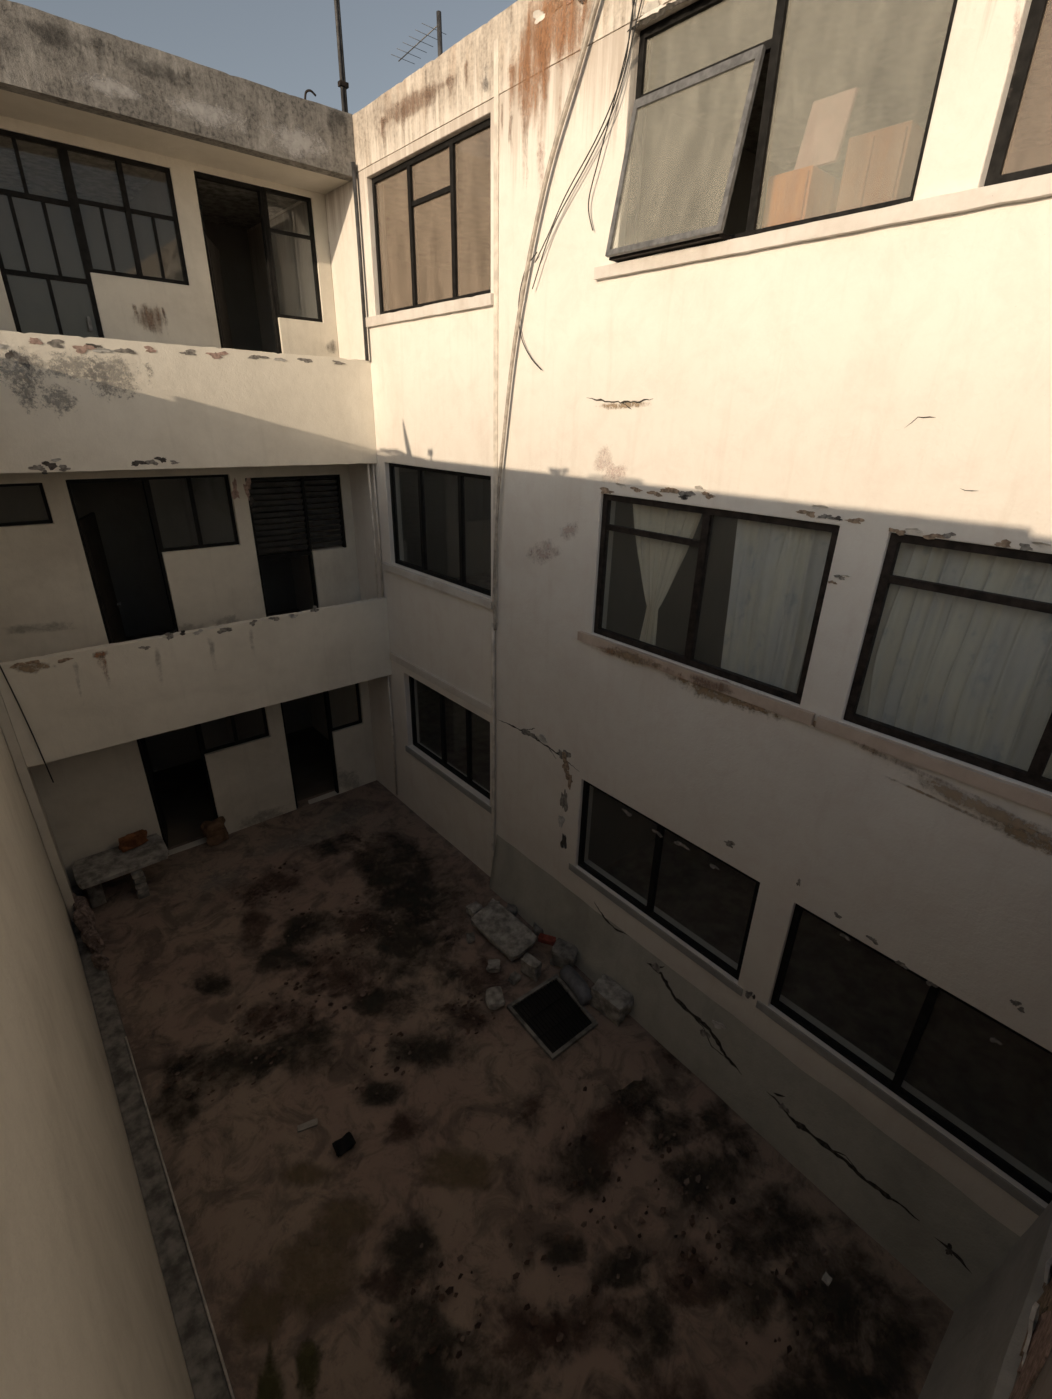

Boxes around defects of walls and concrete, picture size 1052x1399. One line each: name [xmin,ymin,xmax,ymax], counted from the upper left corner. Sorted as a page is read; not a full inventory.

rust [509,0,586,121]
water stain [91,77,135,98]
water stain [177,102,234,126]
water stain [271,128,328,158]
peeling [0,337,157,370]
peeling [179,349,228,359]
peeling [131,457,180,466]
peeling [600,483,714,500]
peeling [796,505,865,524]
crack [502,721,577,770]
crack [594,902,629,936]
crack [648,962,970,1272]